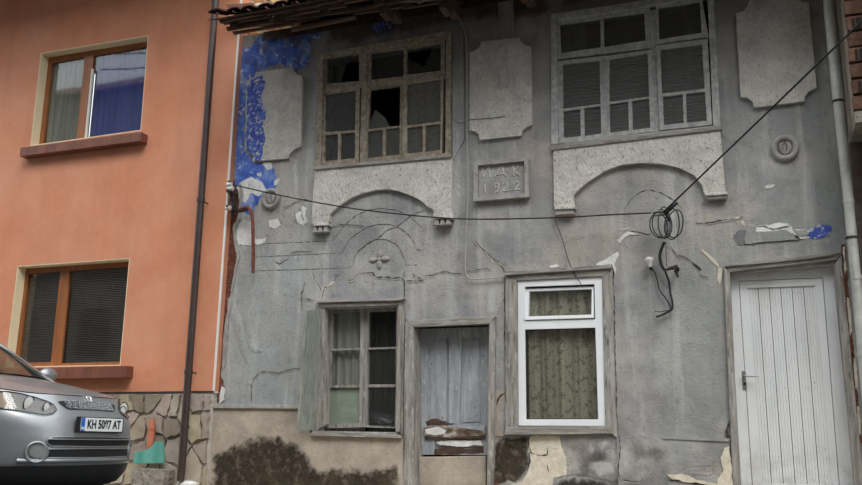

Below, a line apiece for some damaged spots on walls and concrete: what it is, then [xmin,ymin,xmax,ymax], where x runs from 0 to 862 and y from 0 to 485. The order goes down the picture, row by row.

peeling [217,32,322,404]
flaking render [733,222,832,245]
damp [213,436,398,485]
damp [494,435,529,485]
peeling [593,462,613,475]
flaking render [668,420,733,485]